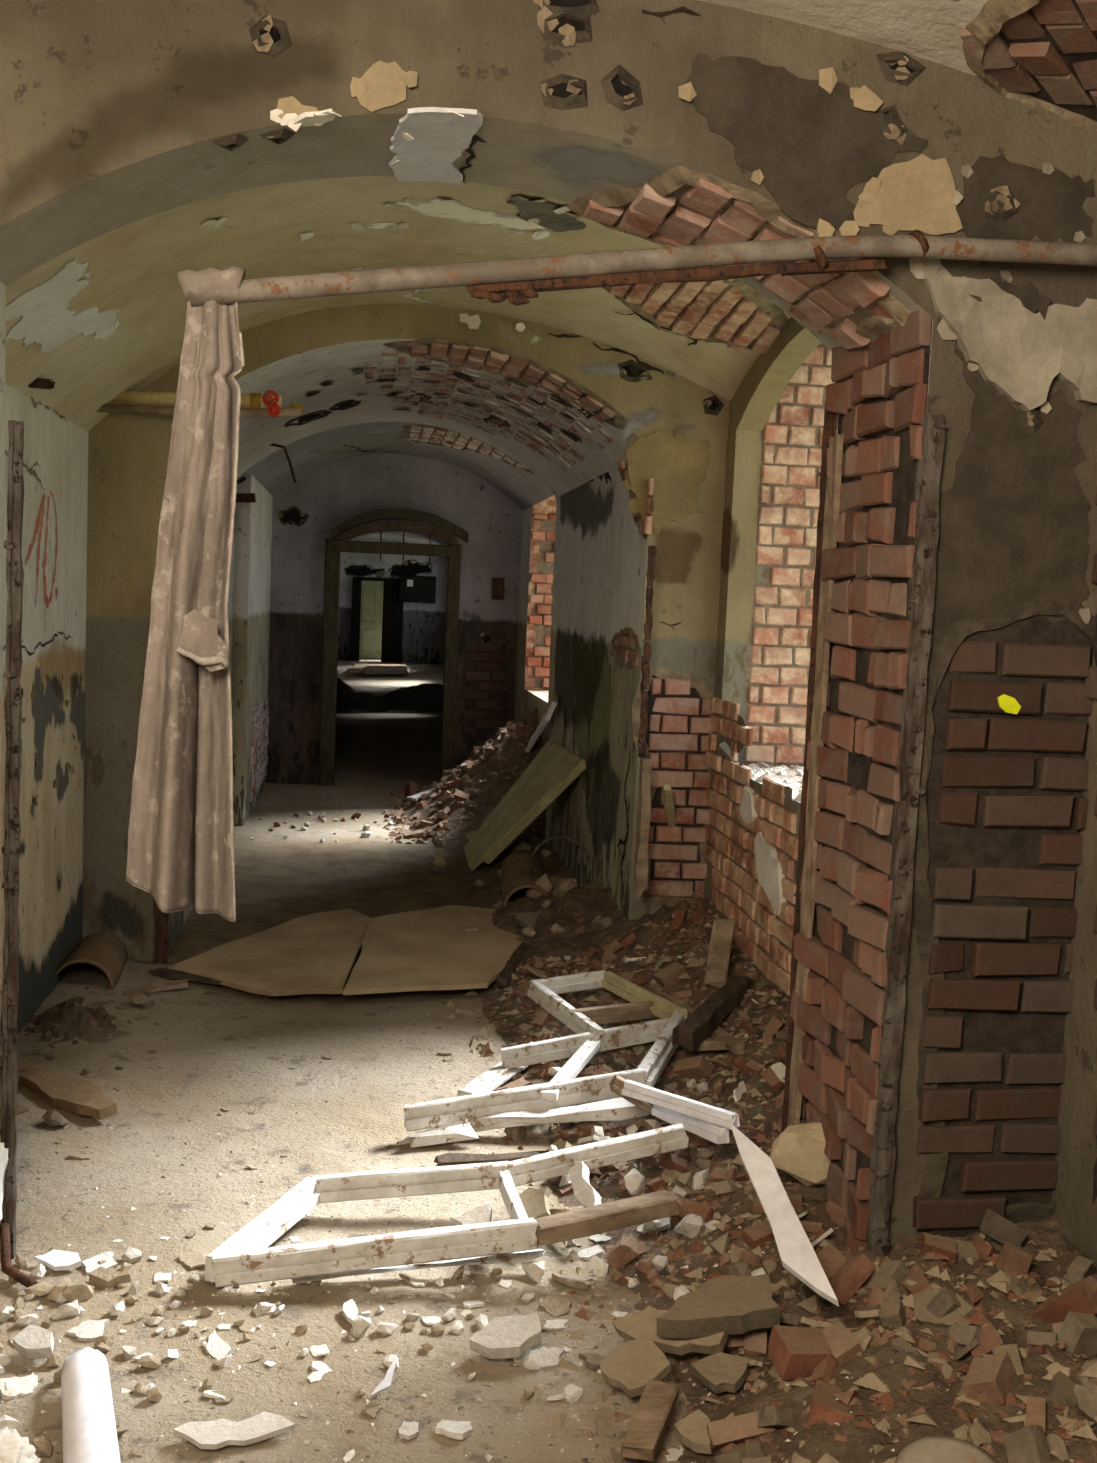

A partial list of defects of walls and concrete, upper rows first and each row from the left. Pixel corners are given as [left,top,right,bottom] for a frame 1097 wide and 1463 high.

flaking render [957,0,1097,133]
crack [459,134,486,184]
spalling [350,51,1095,247]
peeling [6,258,120,352]
rust [531,258,890,292]
flaking render [284,313,711,540]
crack [3,631,73,656]
leakage [554,629,621,874]
flaking render [602,258,1097,1253]